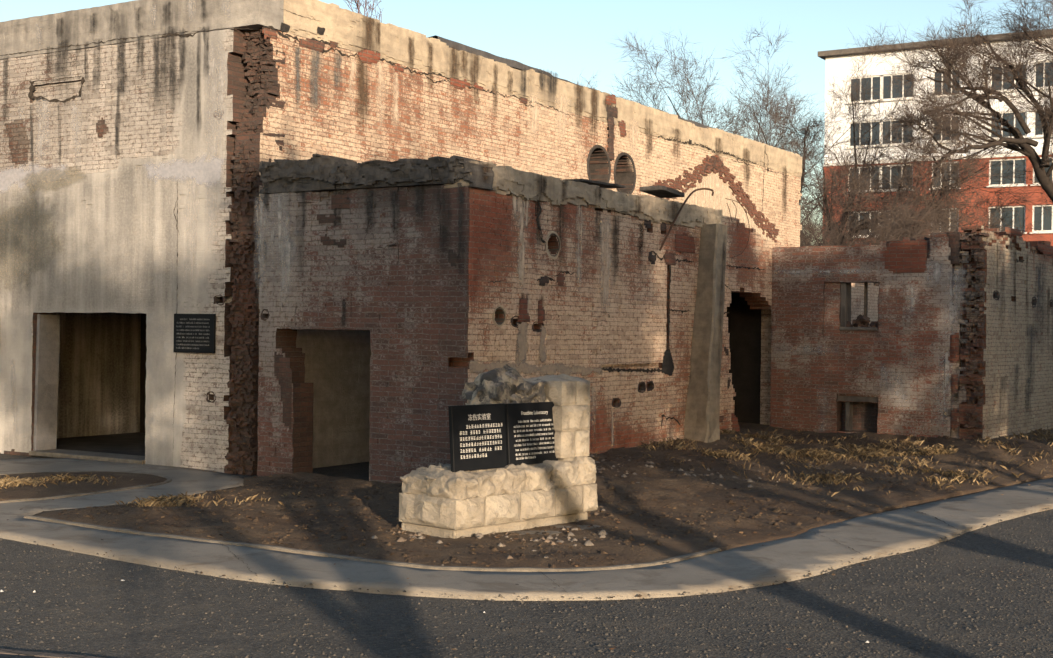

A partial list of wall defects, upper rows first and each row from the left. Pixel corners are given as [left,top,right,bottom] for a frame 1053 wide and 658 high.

leakage [47,19,67,70]
leakage [115,39,125,147]
leakage [137,0,224,130]
crack [0,9,572,118]
leakage [296,48,319,104]
leakage [335,17,398,120]
leakage [452,48,478,95]
leakage [493,66,612,133]
leakage [30,103,47,159]
leakage [630,120,652,155]
spalling [317,192,350,248]
spalling [0,449,32,457]